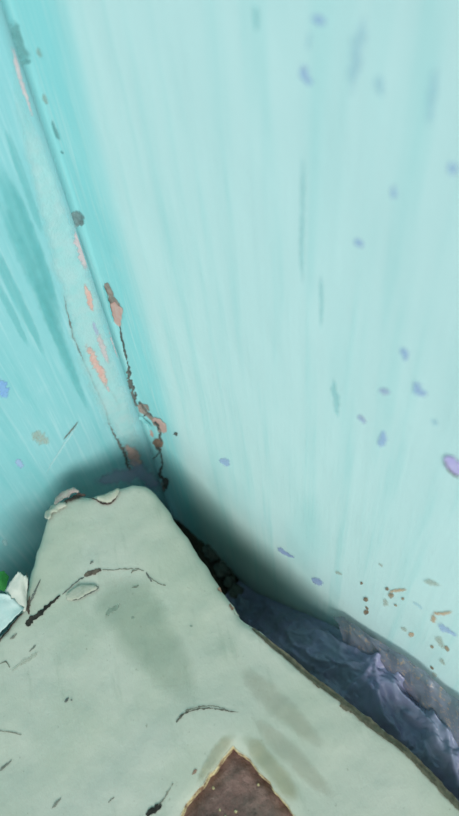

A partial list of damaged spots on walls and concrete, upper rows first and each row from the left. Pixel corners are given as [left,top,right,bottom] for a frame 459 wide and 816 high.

peeling [103,283,123,326]
crack [64,298,132,474]
peeling [87,332,117,392]
crack [119,326,168,487]
spalling [137,403,178,451]
peeling [45,487,120,519]
crack [0,568,166,641]
crack [176,705,236,722]